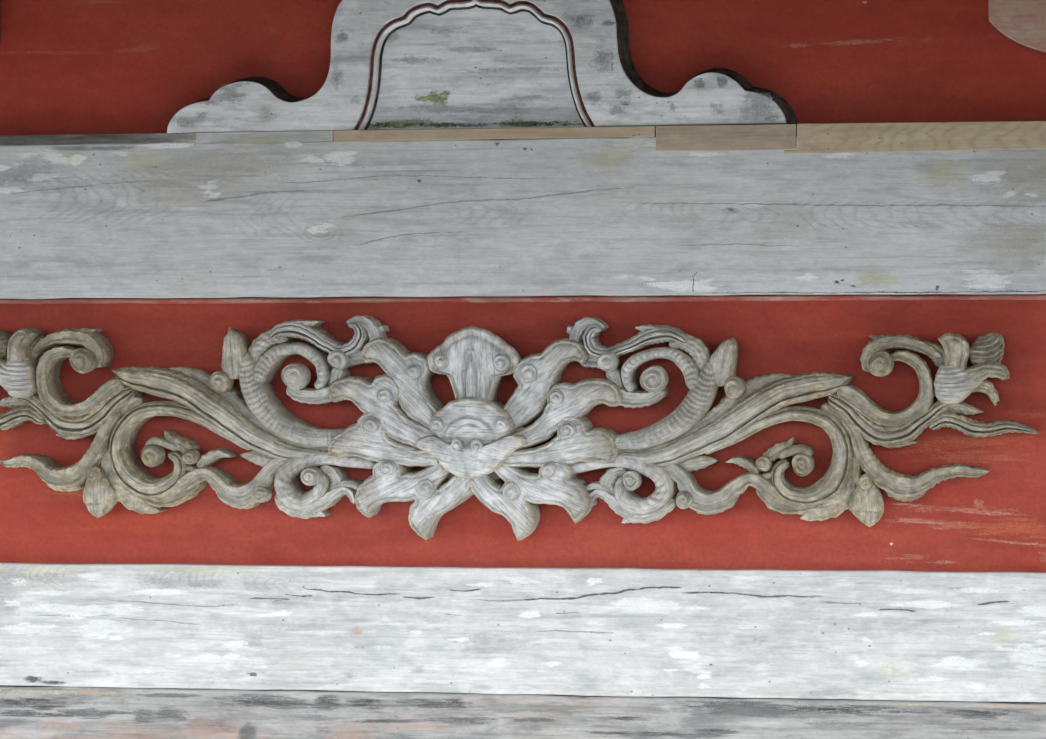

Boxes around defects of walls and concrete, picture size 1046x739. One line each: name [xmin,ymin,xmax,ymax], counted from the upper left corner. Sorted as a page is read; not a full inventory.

crack [205,175,1043,245]
peeling [889,499,1046,561]
crack [40,586,916,634]